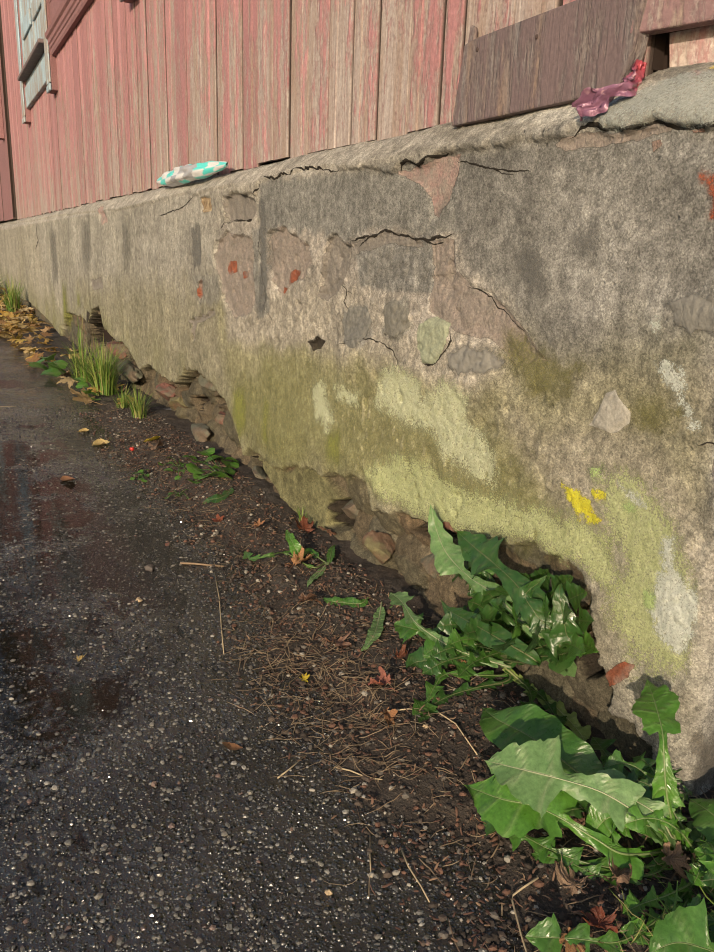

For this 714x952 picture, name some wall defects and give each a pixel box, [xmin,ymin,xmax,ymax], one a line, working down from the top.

crack [570,120,714,139]
crack [400,153,529,175]
flaking render [201,193,257,224]
crack [351,229,452,247]
flaking render [228,261,250,279]
flaking render [283,269,301,293]
flaking render [307,336,325,351]
damp [654,359,702,431]
damp [649,536,700,654]